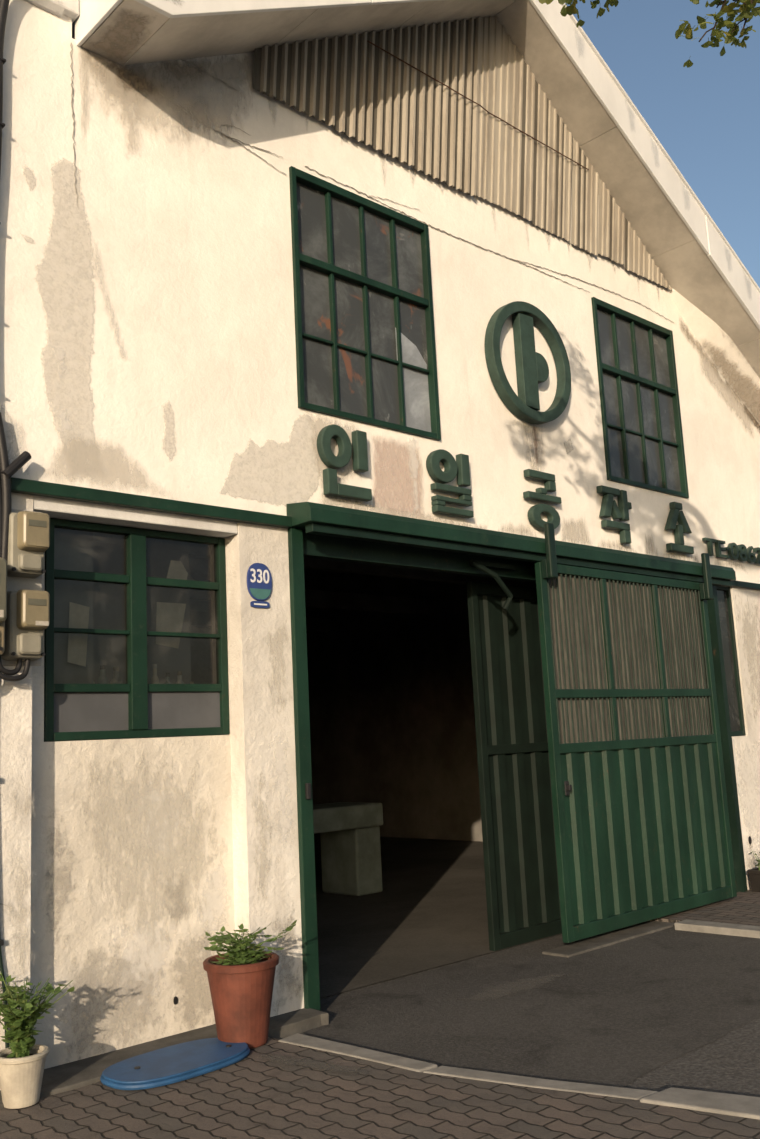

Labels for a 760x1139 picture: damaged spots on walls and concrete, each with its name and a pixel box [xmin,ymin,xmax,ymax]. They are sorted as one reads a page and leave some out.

leakage [88,12,247,141]
crack [160,93,674,323]
peeling [24,158,145,486]
peeling [163,402,175,459]
peeling [221,415,354,505]
leakage [682,325,760,429]